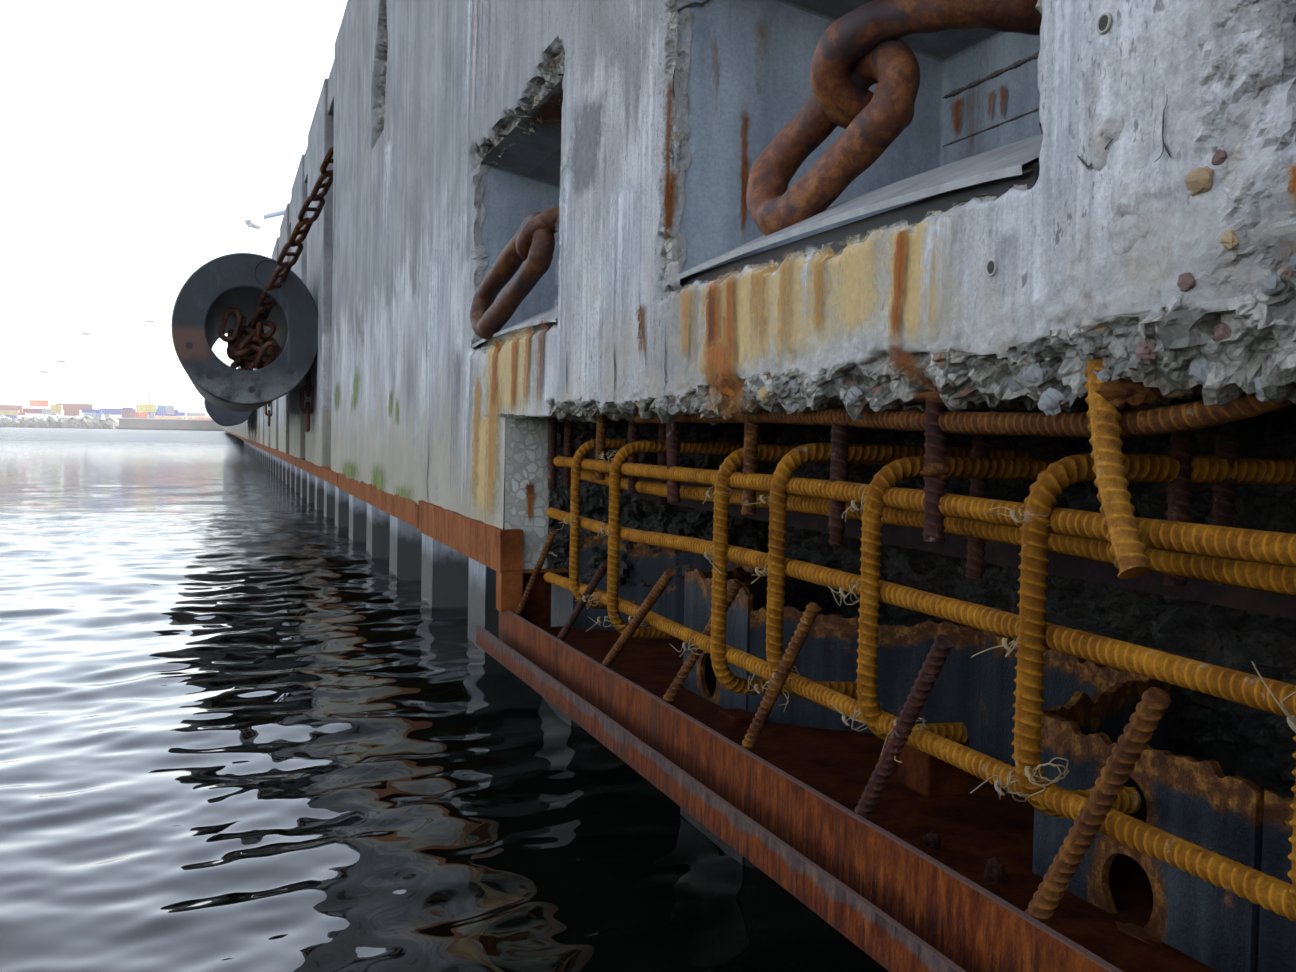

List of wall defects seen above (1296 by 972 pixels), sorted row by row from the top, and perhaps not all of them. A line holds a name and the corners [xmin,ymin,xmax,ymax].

spalling [371,9,388,148]
spalling [475,36,565,166]
rust [472,319,551,513]
rust [526,484,534,519]
rust [679,216,951,415]
spalling [545,0,1296,685]
spalling [662,619,711,705]
spalling [741,578,860,752]
spalling [855,601,966,821]
spalling [1025,684,1296,925]